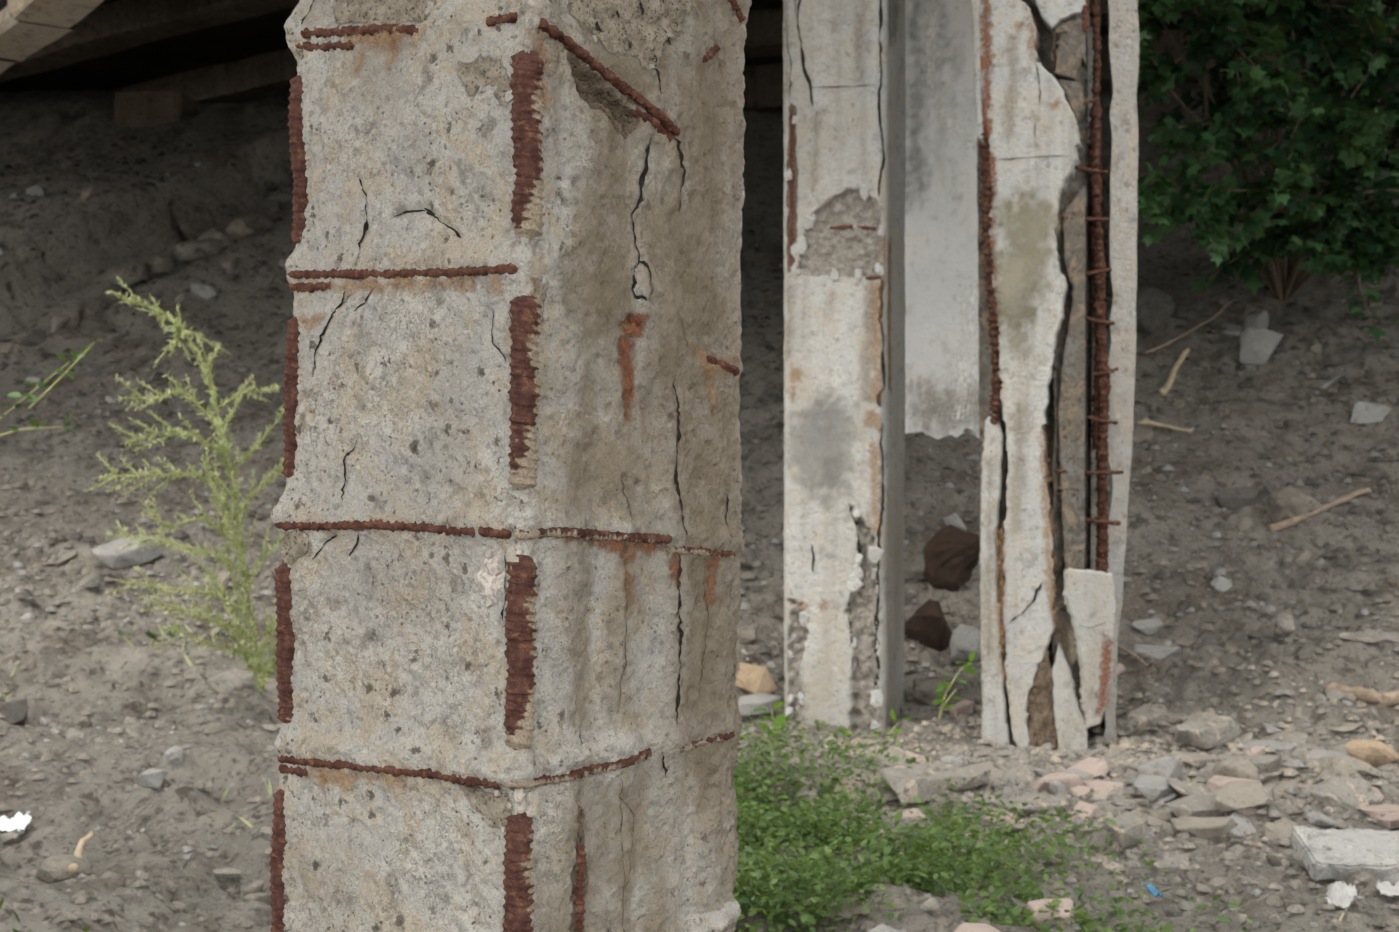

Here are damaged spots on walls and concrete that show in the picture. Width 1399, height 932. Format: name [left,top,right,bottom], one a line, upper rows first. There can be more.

crack [358,179,461,250]
spalling [568,55,640,139]
crack [632,135,686,301]
spalling [784,105,885,283]
crack [786,0,885,196]
corrosion [980,0,1001,325]
corrosion [618,314,648,419]
corrosion [588,539,659,604]
crack [673,384,732,723]
spalling [846,506,884,730]
corrosion [997,530,1005,651]
spalling [1027,649,1057,750]